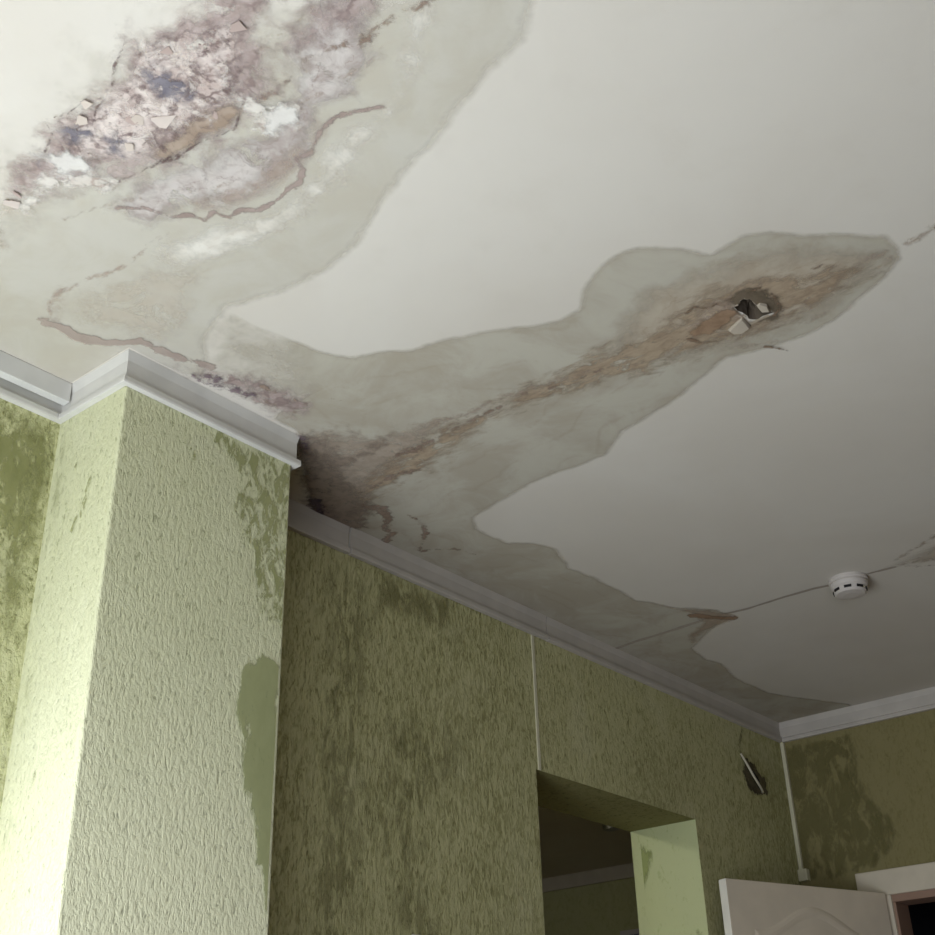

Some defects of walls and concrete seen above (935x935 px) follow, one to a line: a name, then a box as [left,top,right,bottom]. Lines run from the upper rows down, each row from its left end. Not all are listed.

peeling [3,0,301,214]
water stain [0,0,897,723]
spalling [622,253,871,356]
water stain [237,654,279,913]
water stain [788,738,892,878]